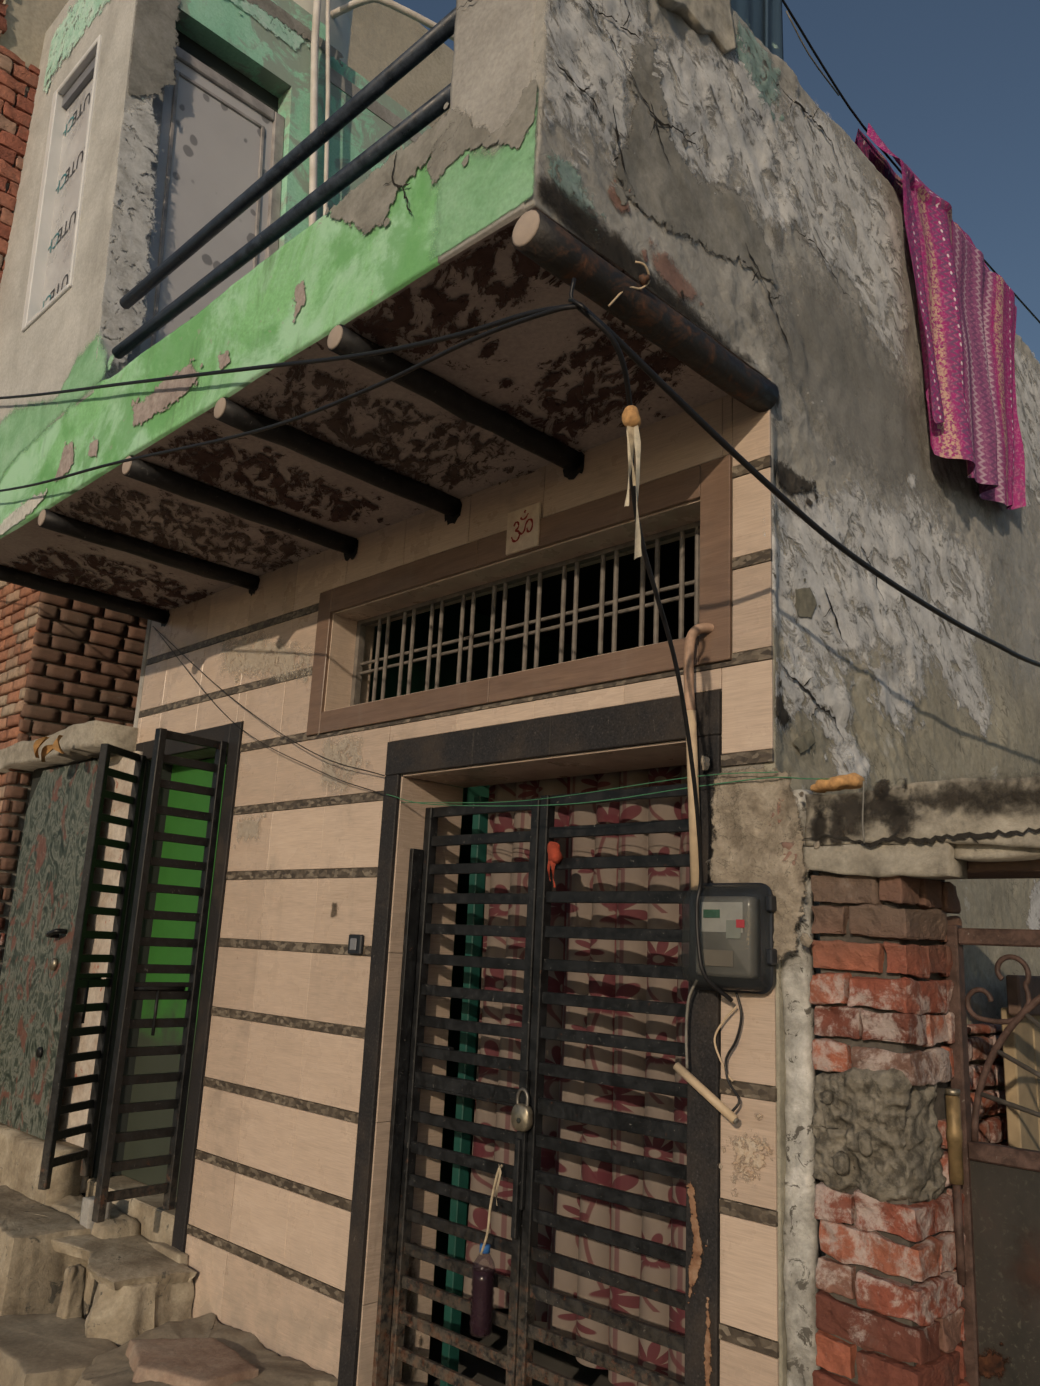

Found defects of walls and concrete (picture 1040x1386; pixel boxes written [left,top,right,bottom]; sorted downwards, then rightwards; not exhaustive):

flaking render [128,0,181,102]
peeling [231,0,343,67]
crack [383,152,412,216]
peeling [325,0,908,366]
corrosion [538,177,755,364]
crack [745,243,793,361]
peeling [131,350,230,426]
peeling [242,364,535,496]
peeling [499,313,685,454]
peeling [771,459,994,782]
crack [804,827,1040,848]
leakage [809,774,1040,845]